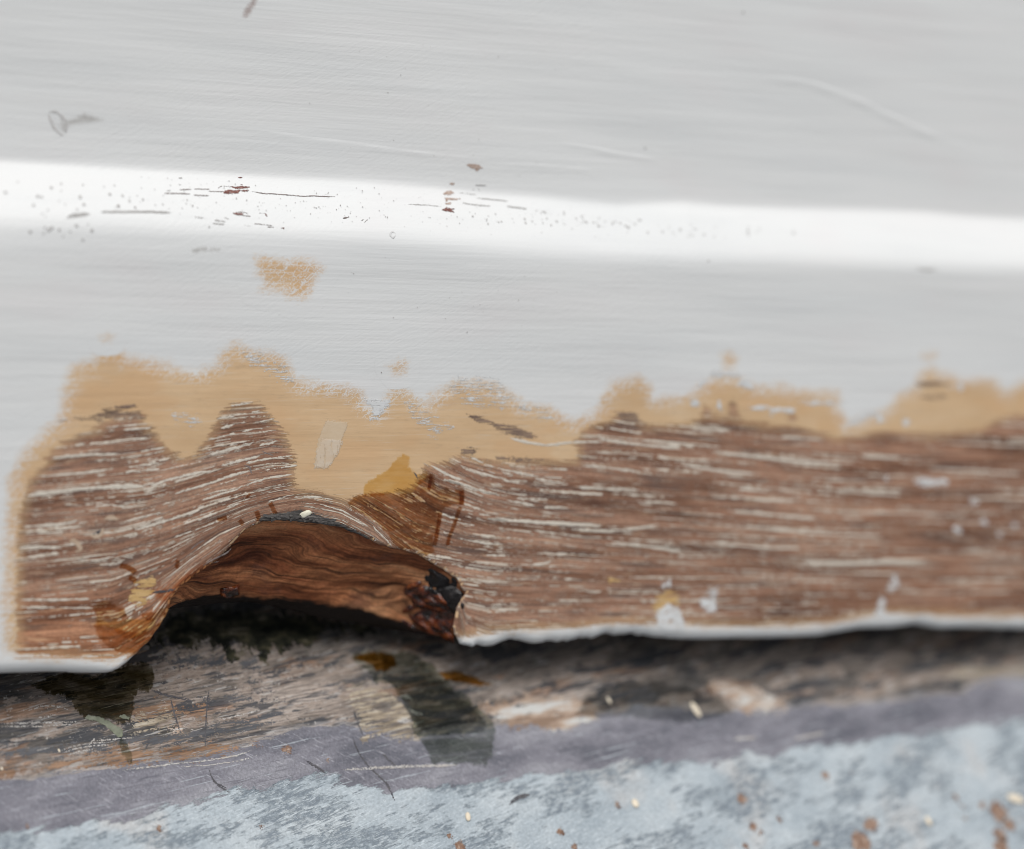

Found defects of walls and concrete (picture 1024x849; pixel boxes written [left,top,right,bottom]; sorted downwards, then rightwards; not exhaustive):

peeling [236,227,340,320]
peeling [0,325,1024,781]